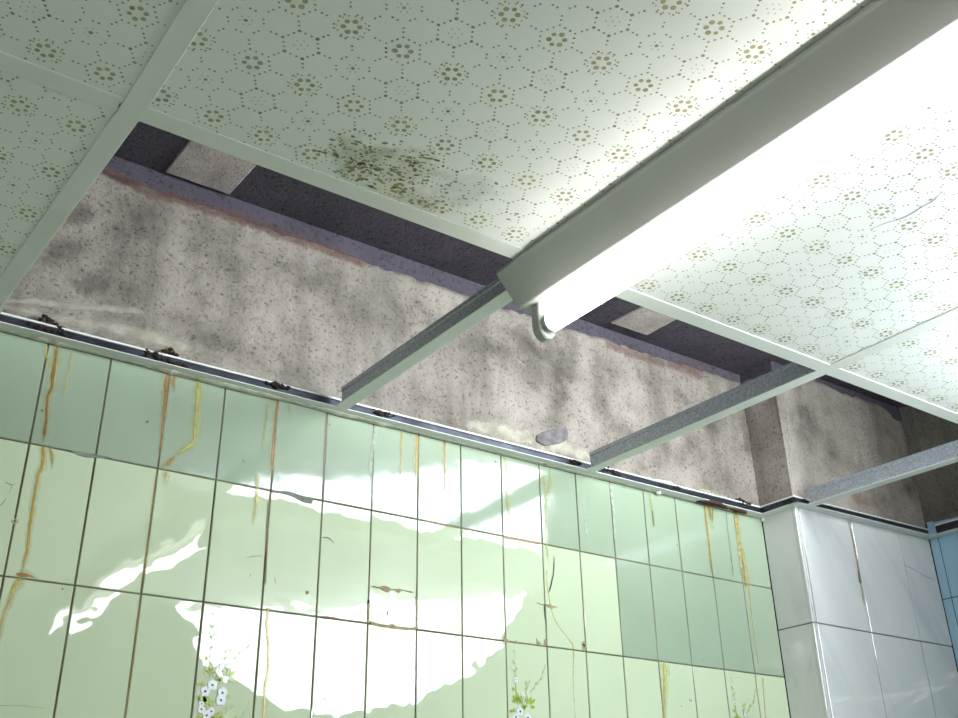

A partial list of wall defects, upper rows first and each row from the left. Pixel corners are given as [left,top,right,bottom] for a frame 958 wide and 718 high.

damp [317,129,468,214]
corrosion [43,347,58,435]
spalling [69,450,111,459]
corrosion [160,375,175,448]
corrosion [166,382,200,477]
corrosion [270,398,279,471]
spalling [536,428,568,446]
corrosion [0,447,53,629]
spalling [271,491,314,504]
spalling [696,496,747,514]
corrosion [726,512,749,585]